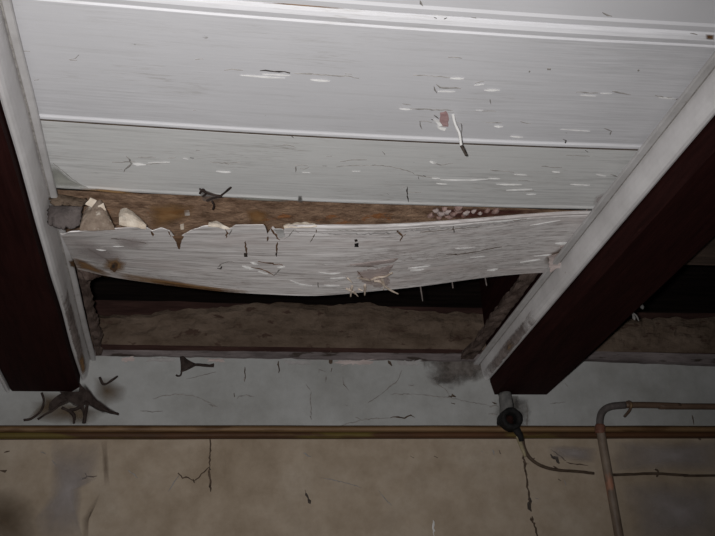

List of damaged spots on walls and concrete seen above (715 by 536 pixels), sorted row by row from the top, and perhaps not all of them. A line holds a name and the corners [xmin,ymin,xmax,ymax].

peeling [419,111,467,156]
peeling [432,170,536,195]
peeling [80,198,147,231]
peeling [208,221,232,238]
peeling [267,222,317,241]
spalling [427,206,531,220]
crack [168,439,212,492]
crack [522,456,538,536]